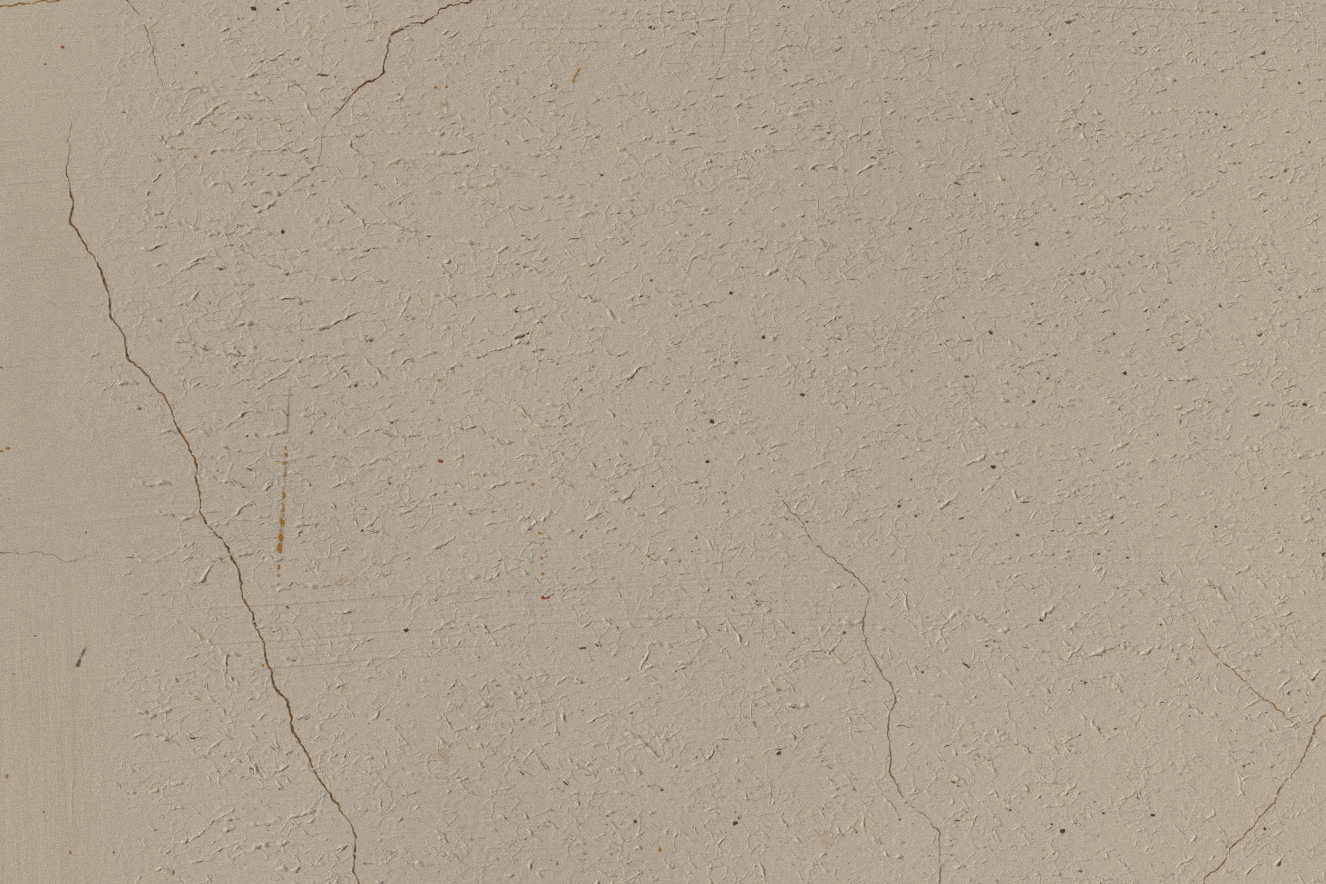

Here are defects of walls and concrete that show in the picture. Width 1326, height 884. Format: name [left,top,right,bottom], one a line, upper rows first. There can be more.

crack [0,0,68,9]
crack [284,0,475,193]
crack [0,550,93,562]
crack [64,114,362,884]
rust [277,447,287,577]
crack [766,462,943,884]
crack [1182,604,1326,884]